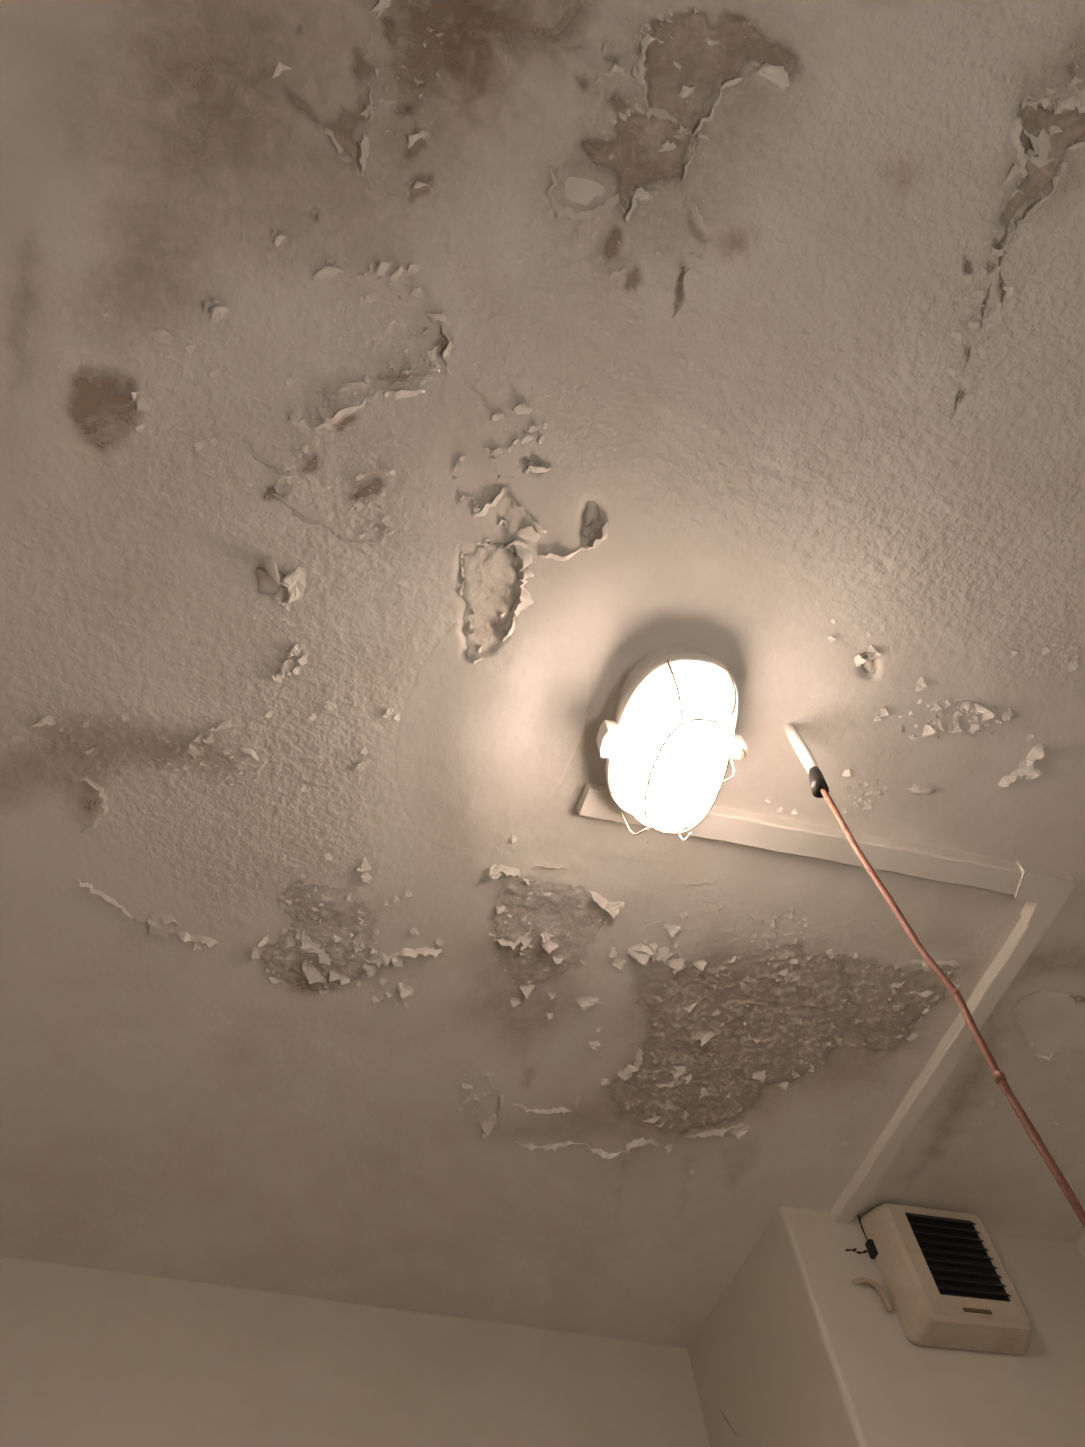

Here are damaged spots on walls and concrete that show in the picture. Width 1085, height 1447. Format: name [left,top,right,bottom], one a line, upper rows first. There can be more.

leakage [405,0,571,87]
peeling [578,6,806,288]
peeling [944,37,1085,421]
leakage [70,373,135,449]
peeling [264,259,456,504]
peeling [246,556,306,621]
peeling [271,644,308,683]
peeling [452,402,609,664]
peeling [874,677,1045,788]
peeling [250,857,444,1010]
peeling [482,864,624,1020]
peeling [513,907,963,1160]